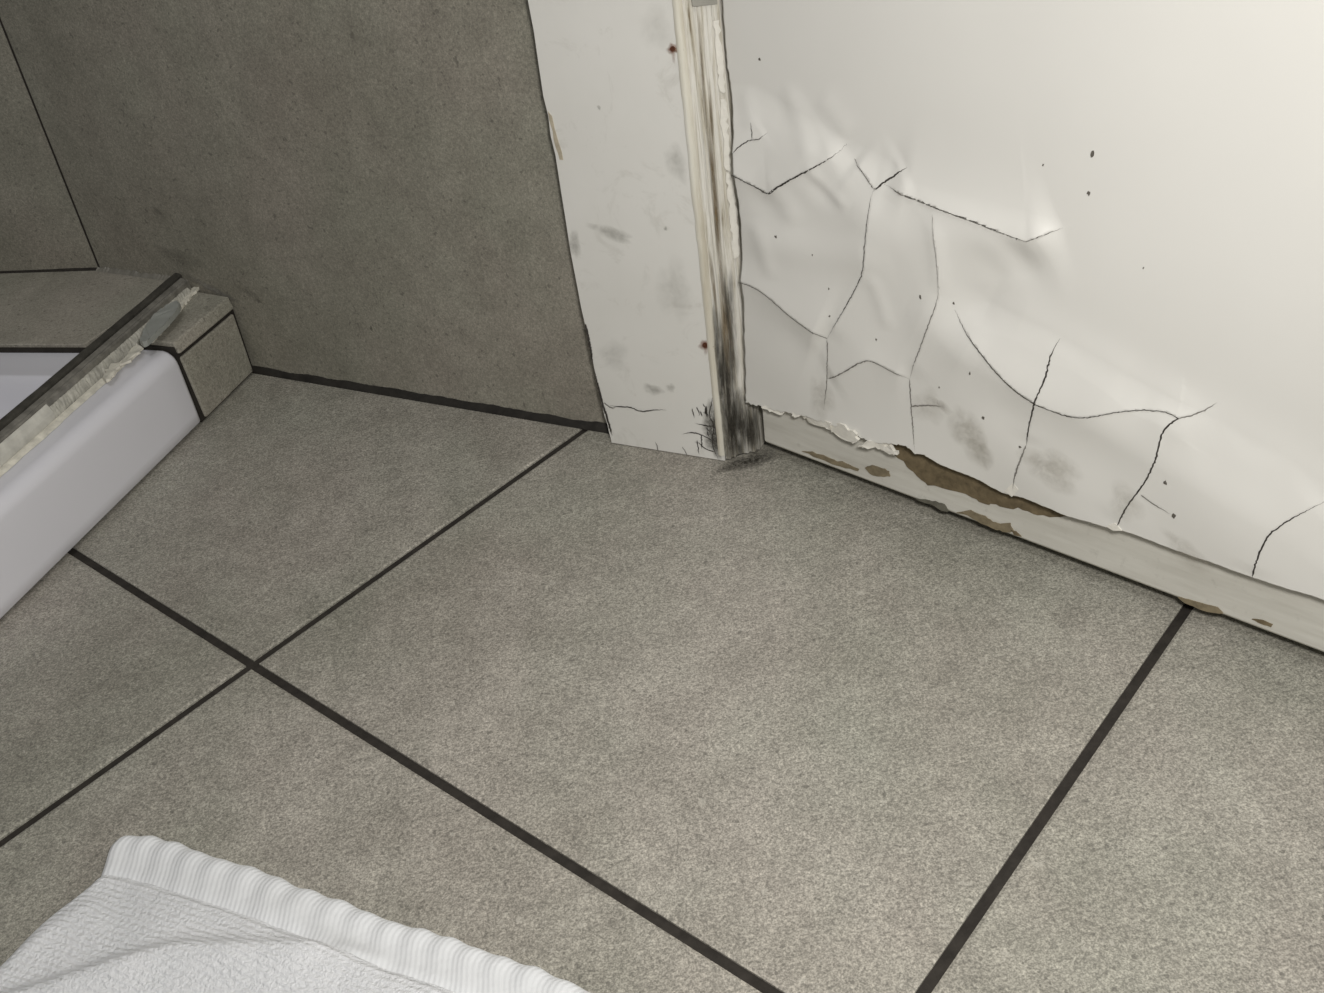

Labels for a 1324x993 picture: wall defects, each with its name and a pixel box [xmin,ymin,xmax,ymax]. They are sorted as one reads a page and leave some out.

water stain [710,151,719,250]
water stain [713,284,767,469]
crack [732,122,1214,525]
peeling [713,20,1324,578]
peeling [1178,597,1223,614]
crack [1252,503,1322,577]